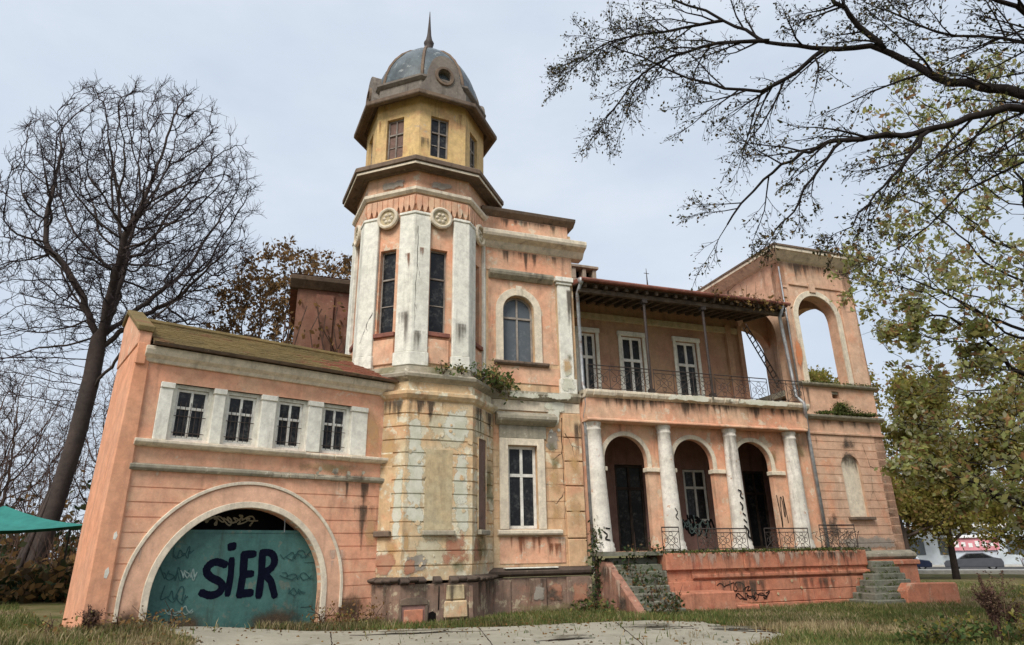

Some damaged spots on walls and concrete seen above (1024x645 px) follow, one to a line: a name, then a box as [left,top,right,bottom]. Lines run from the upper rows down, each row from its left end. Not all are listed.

water stain [399,312,420,342]
water stain [681,402,732,413]
water stain [366,415,395,466]
water stain [359,483,375,541]
flaking render [375,407,485,575]